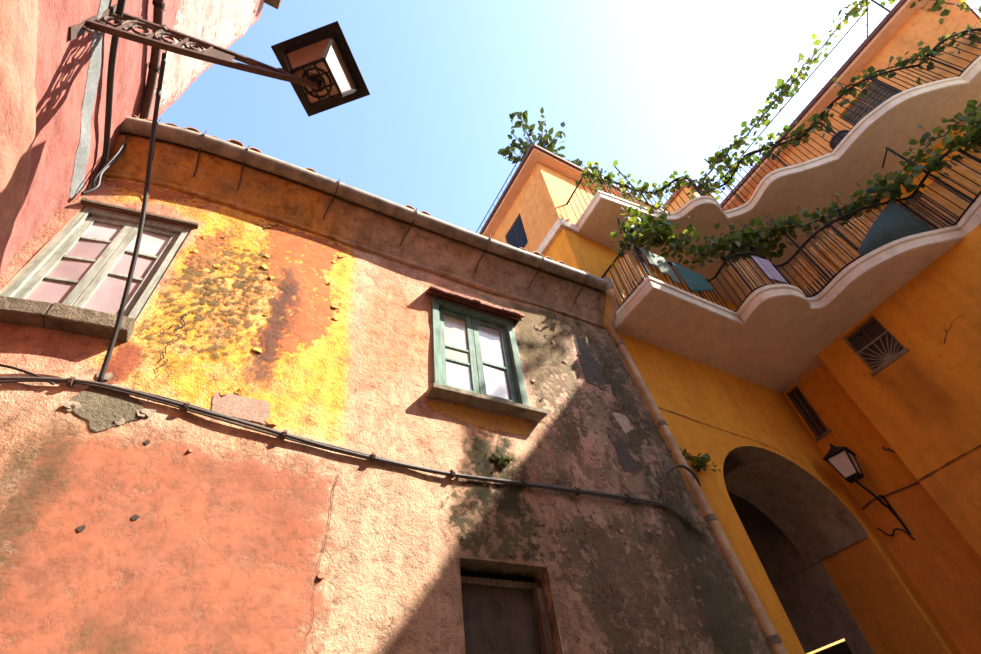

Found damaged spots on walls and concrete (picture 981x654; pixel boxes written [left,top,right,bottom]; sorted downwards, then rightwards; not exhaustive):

peeling [183,232,230,278]
peeling [251,220,347,362]
spalling [515,324,595,453]
spalling [608,412,637,437]
leakage [470,438,521,514]